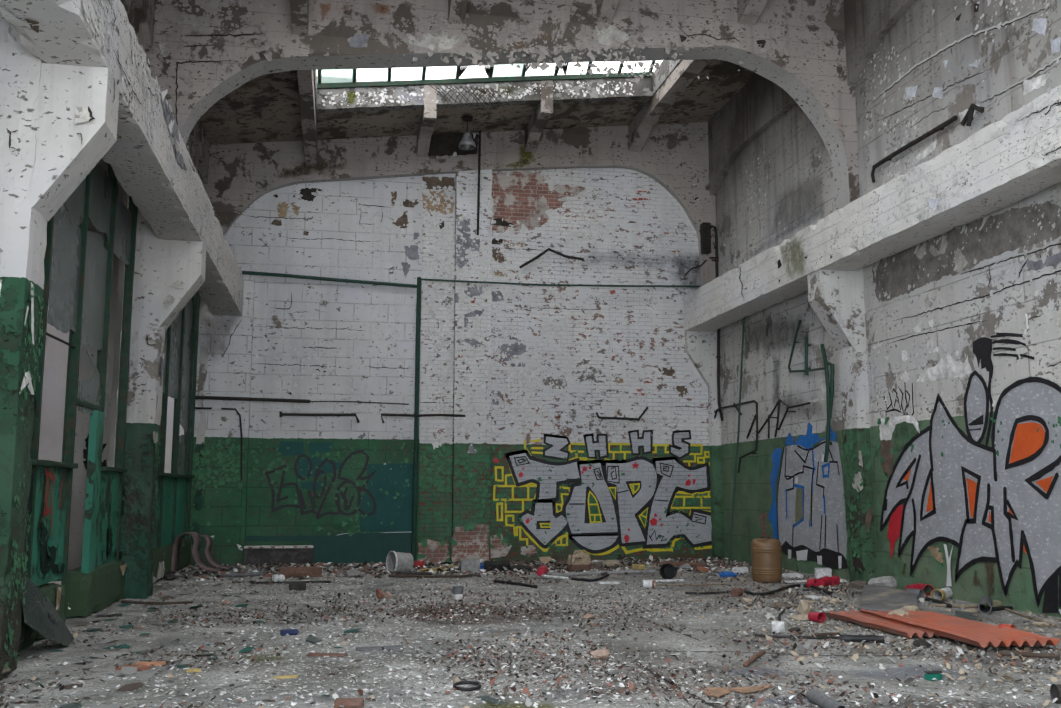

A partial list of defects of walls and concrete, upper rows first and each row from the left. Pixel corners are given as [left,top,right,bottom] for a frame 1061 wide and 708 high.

spalling [26,19,40,33]
peeling [322,11,729,106]
peeling [954,0,1061,63]
peeling [82,0,246,310]
peeling [682,40,980,326]
peeling [960,73,1061,170]
peeling [0,171,1061,708]